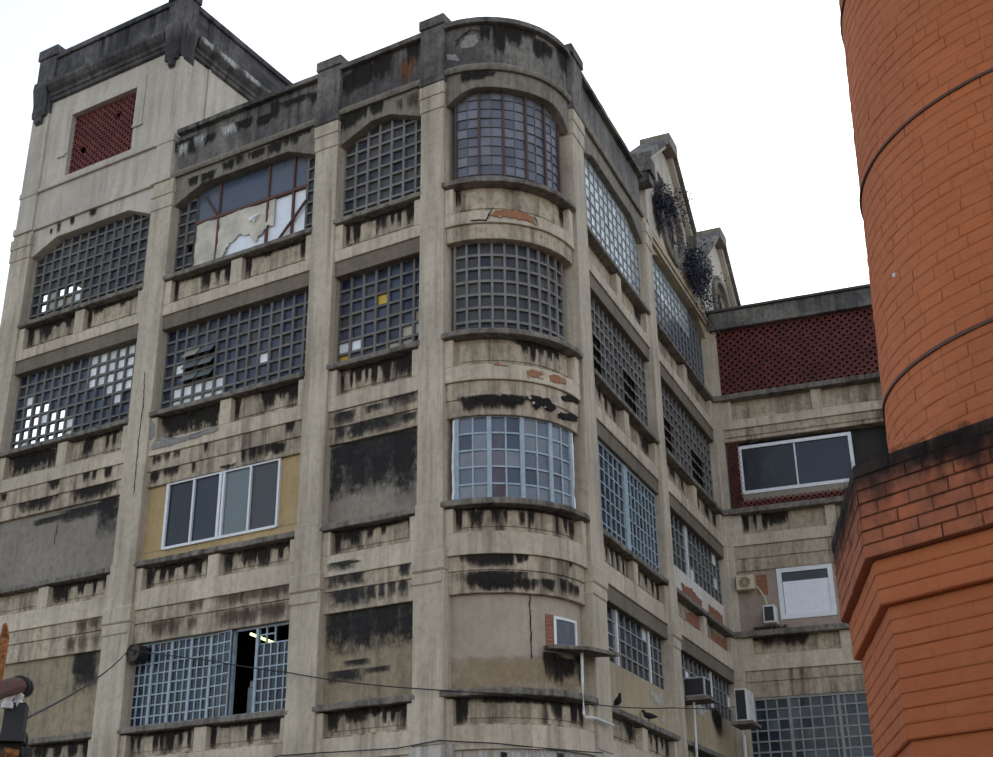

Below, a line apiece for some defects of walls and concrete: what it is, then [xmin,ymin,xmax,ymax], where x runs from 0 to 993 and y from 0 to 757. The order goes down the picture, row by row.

water stain [480,24,567,73]
water stain [460,71,496,82]
water stain [175,92,317,155]
water stain [189,128,311,186]
spalling [489,209,537,226]
water stain [458,394,541,411]
spalling [526,368,579,422]
water stain [330,392,417,498]
water stain [460,554,579,596]
water stain [326,564,413,683]
crack [526,595,534,659]